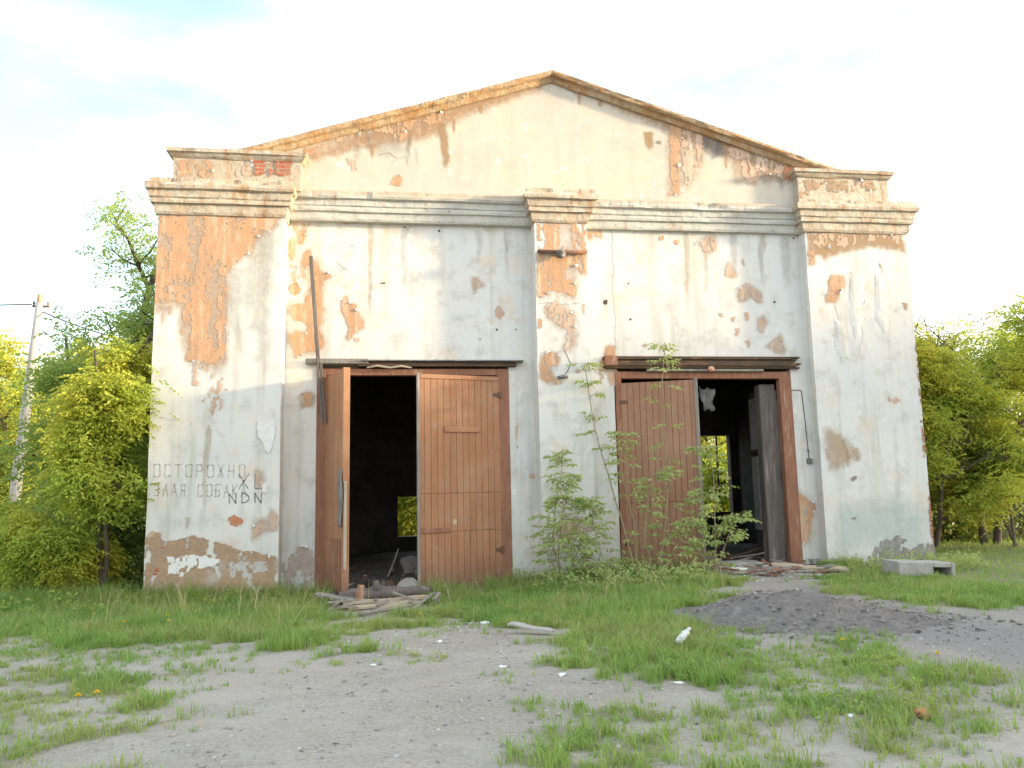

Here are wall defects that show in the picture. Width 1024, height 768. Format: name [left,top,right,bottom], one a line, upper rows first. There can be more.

damp [438,123,449,164]
peeling [669,124,703,196]
peeling [728,145,877,199]
peeling [808,232,900,265]
peeling [155,214,278,430]
peeling [288,222,331,357]
peeling [339,296,364,342]
peeling [537,222,601,384]
peeling [718,259,767,348]
peeling [826,275,844,302]
spalling [868,481,935,564]
spalling [143,531,315,595]